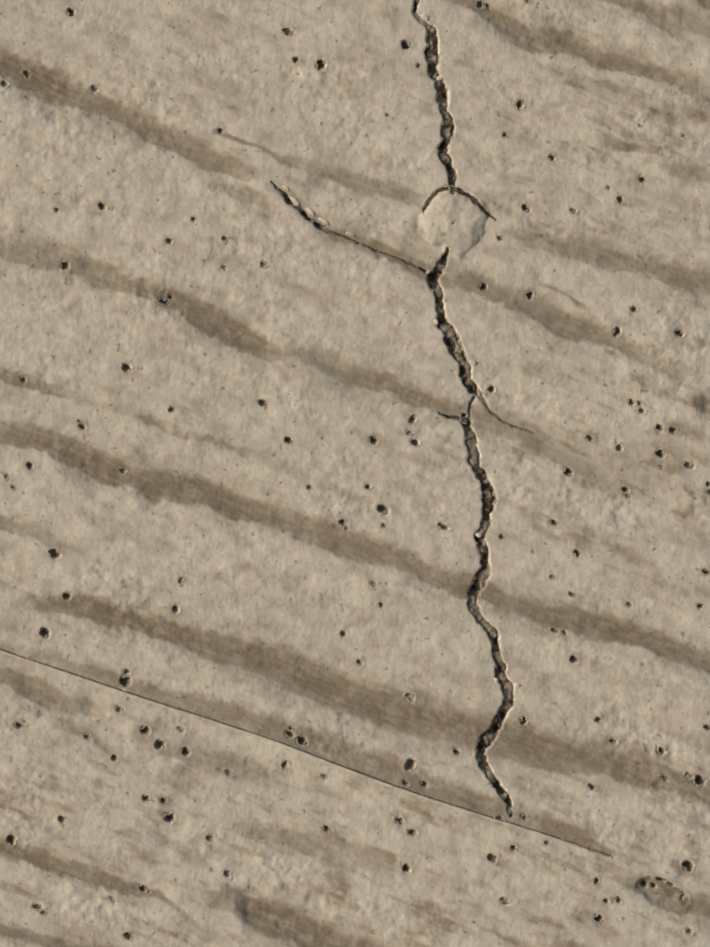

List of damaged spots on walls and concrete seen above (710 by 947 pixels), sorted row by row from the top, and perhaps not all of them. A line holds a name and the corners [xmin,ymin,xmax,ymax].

crack [412,0,497,221]
crack [0,182,613,857]